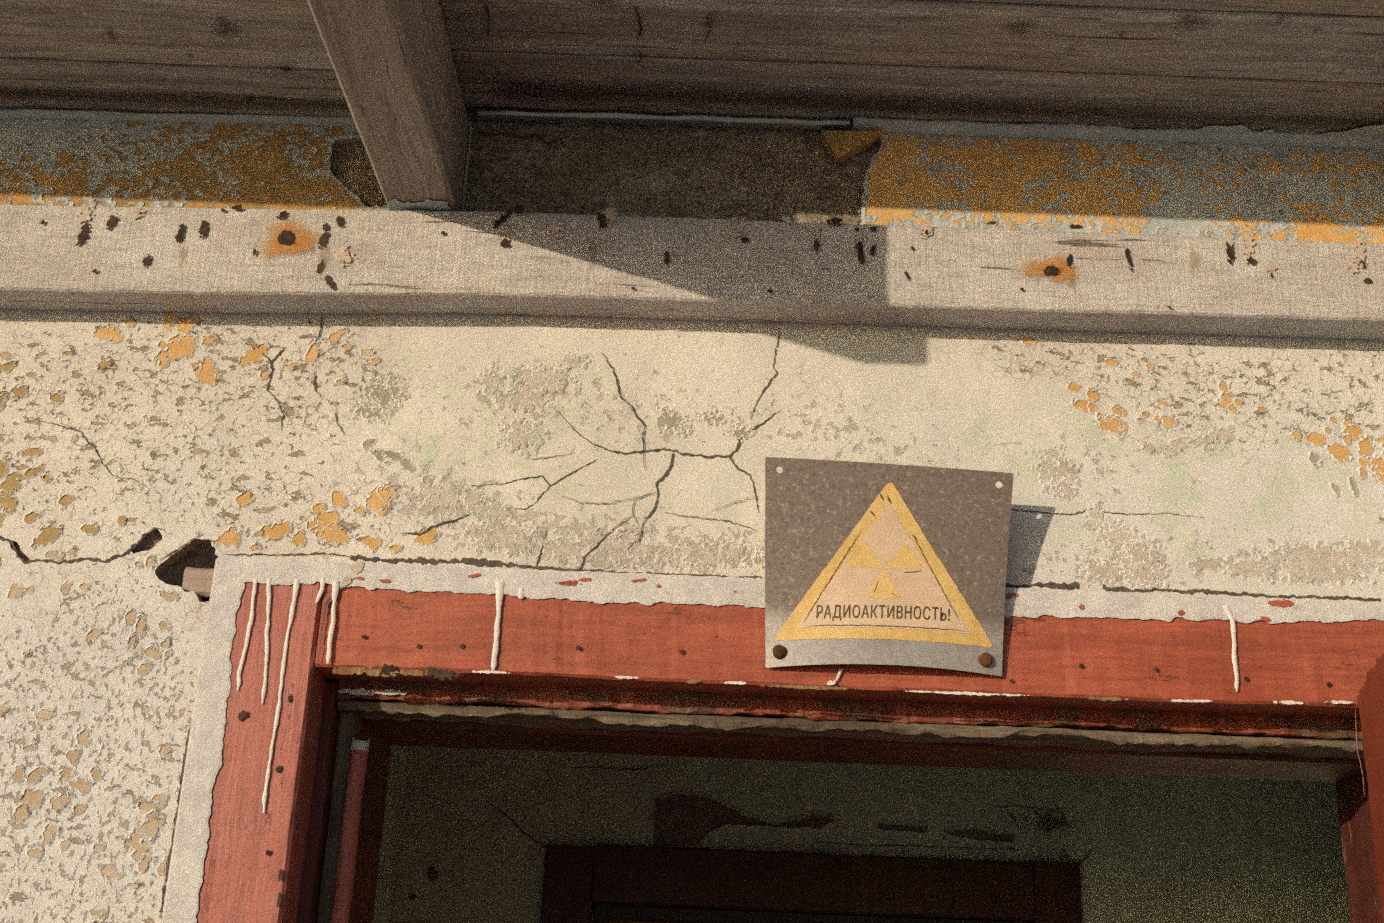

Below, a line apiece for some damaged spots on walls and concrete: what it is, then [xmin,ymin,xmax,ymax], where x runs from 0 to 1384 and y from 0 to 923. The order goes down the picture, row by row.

peeling [0,119,387,289]
rust [265,221,318,257]
flaking render [464,107,1384,274]
rust [1024,257,1073,282]
peeling [0,359,37,411]
peeling [0,445,99,565]
crack [0,317,780,578]
peeling [1065,379,1268,458]
peeling [1288,415,1384,498]
peeling [332,666,431,696]
peeling [11,726,106,863]
peeling [91,792,170,889]